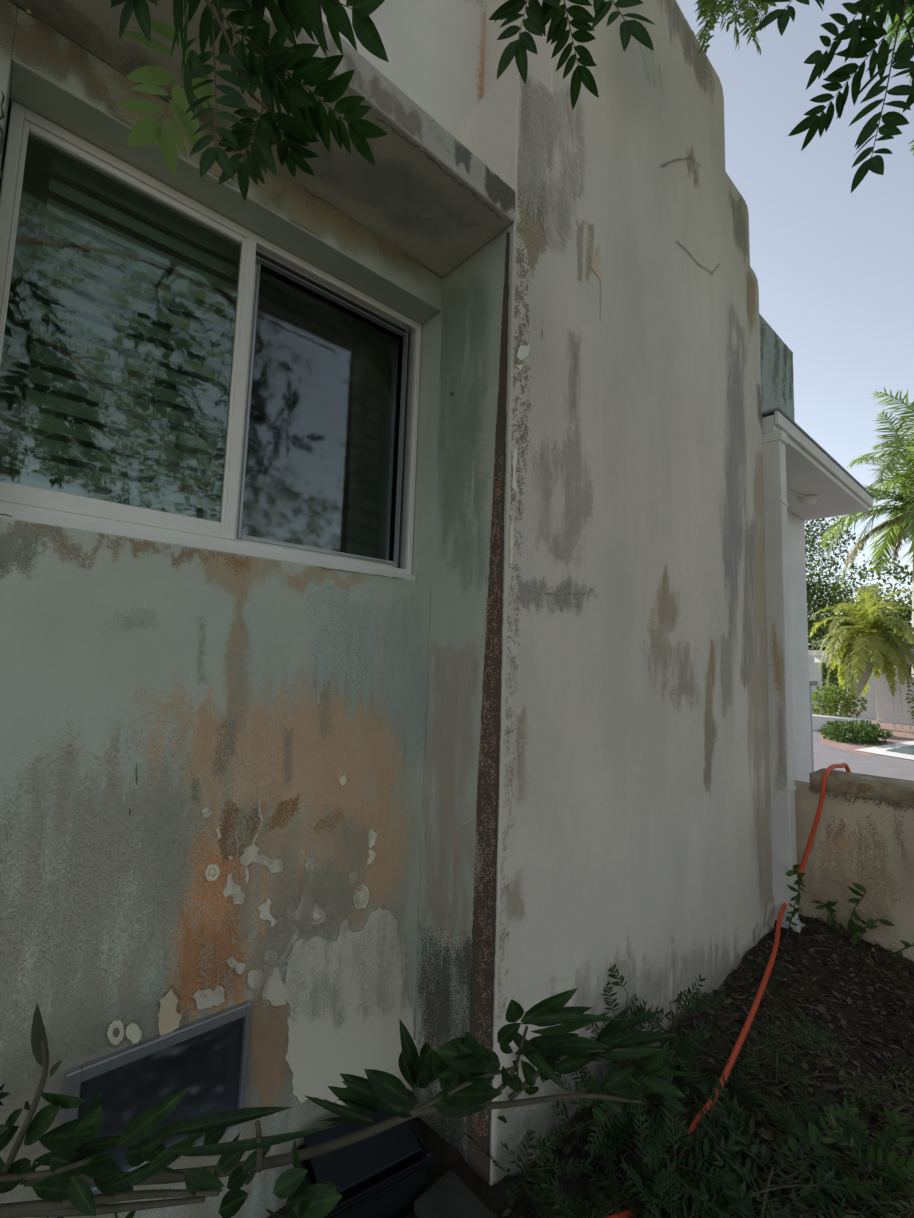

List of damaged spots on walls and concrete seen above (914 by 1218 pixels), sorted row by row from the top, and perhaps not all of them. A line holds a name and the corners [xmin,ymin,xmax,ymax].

damp [190,118,550,1055]
damp [809,789,914,863]
peeling [205,844,283,904]
peeling [107,1020,142,1045]
peeling [157,989,182,1036]
peeling [192,984,225,1009]
peeling [227,829,415,1106]
damp [413,1078,492,1183]